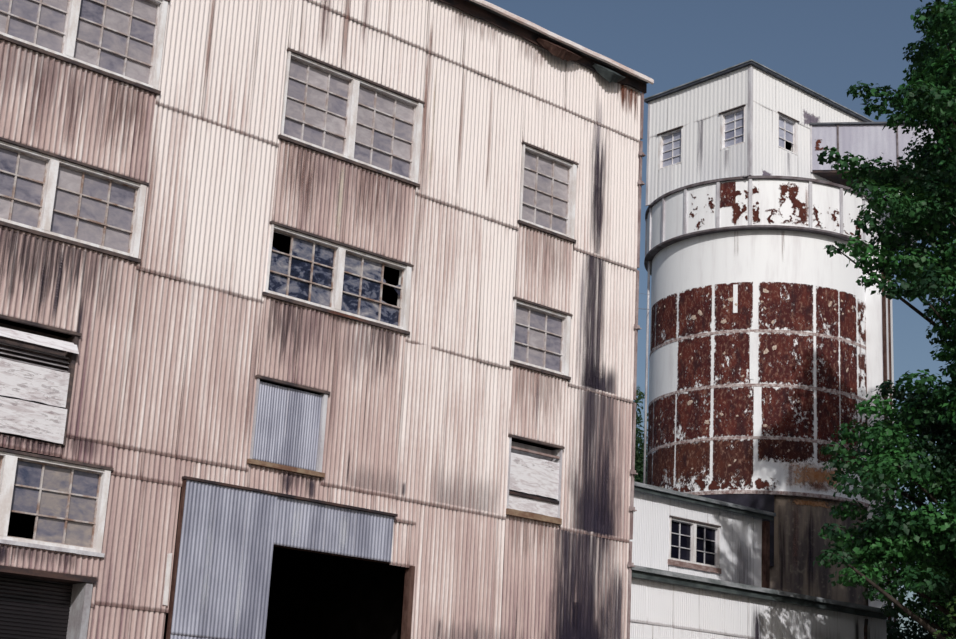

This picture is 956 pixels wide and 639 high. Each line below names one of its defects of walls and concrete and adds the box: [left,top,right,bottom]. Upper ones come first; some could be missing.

corrosion [621,84,637,106]
water stain [593,138,603,238]
water stain [53,257,63,312]
corrosion [647,282,867,491]
water stain [557,255,622,639]
water stain [753,613,761,639]